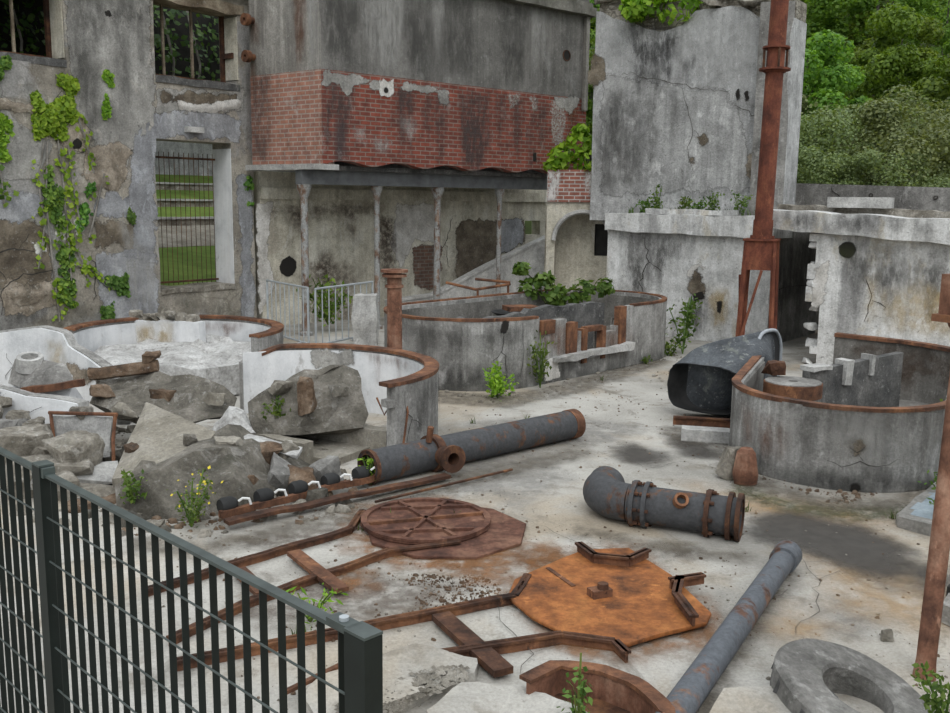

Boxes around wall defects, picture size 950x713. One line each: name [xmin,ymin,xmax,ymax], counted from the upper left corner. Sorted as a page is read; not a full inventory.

spalling [160,90,242,114]
peeling [551,100,566,145]
peeling [587,54,752,198]
crack [0,234,55,315]
peeling [390,202,442,290]
crack [638,239,661,292]
spalling [687,262,706,301]